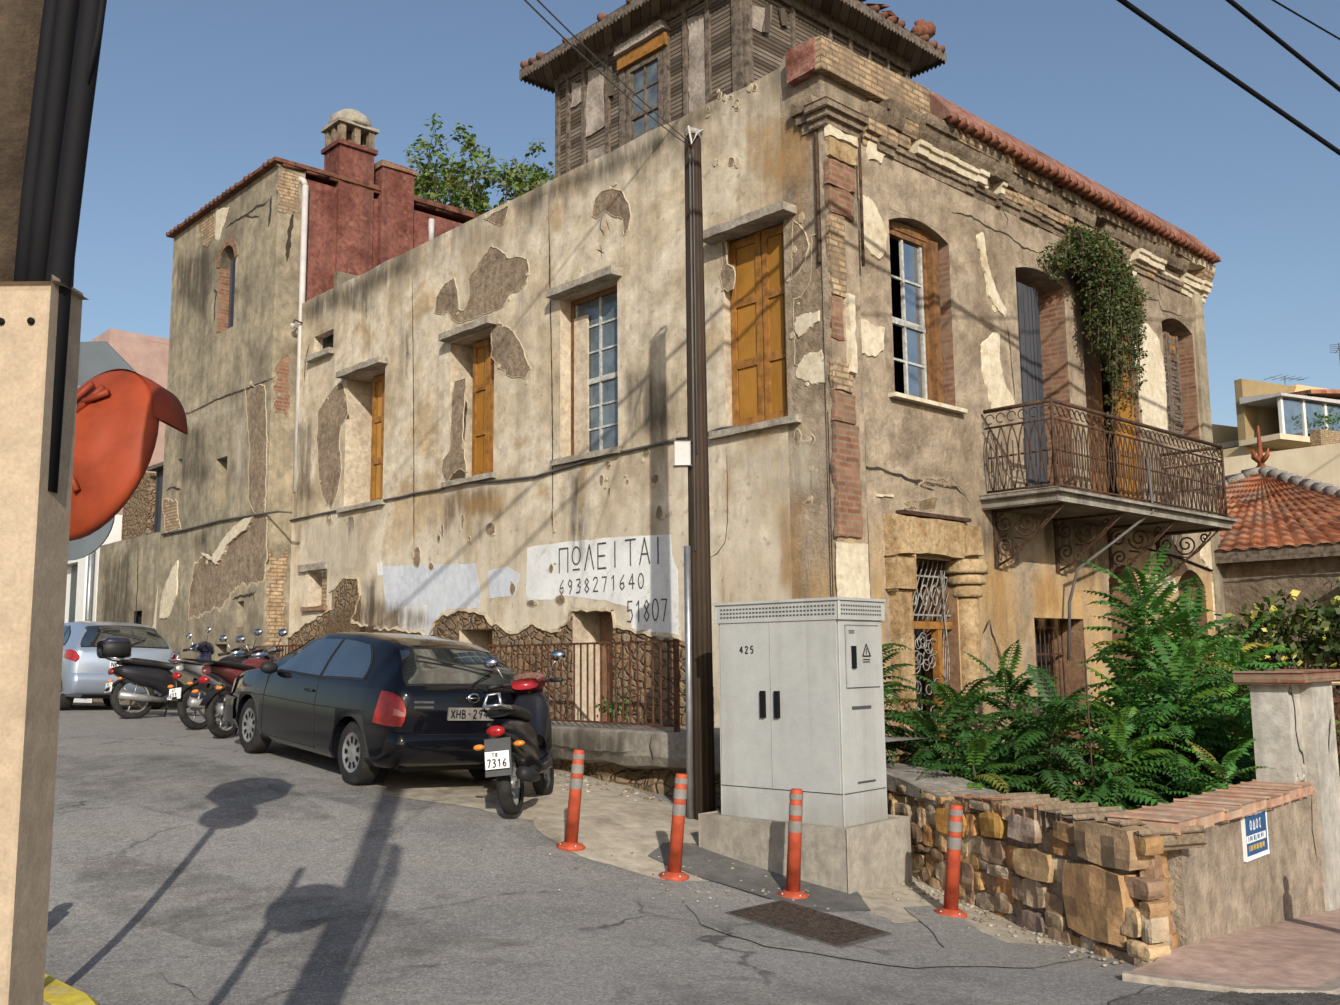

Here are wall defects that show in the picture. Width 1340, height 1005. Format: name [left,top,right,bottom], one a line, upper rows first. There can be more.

crack [226,197,294,261]
peeling [592,182,631,236]
peeling [857,195,887,260]
peeling [434,246,531,385]
peeling [976,232,1015,413]
peeling [152,355,291,658]
peeling [316,382,355,535]
crack [866,466,965,496]
spalling [509,581,538,607]